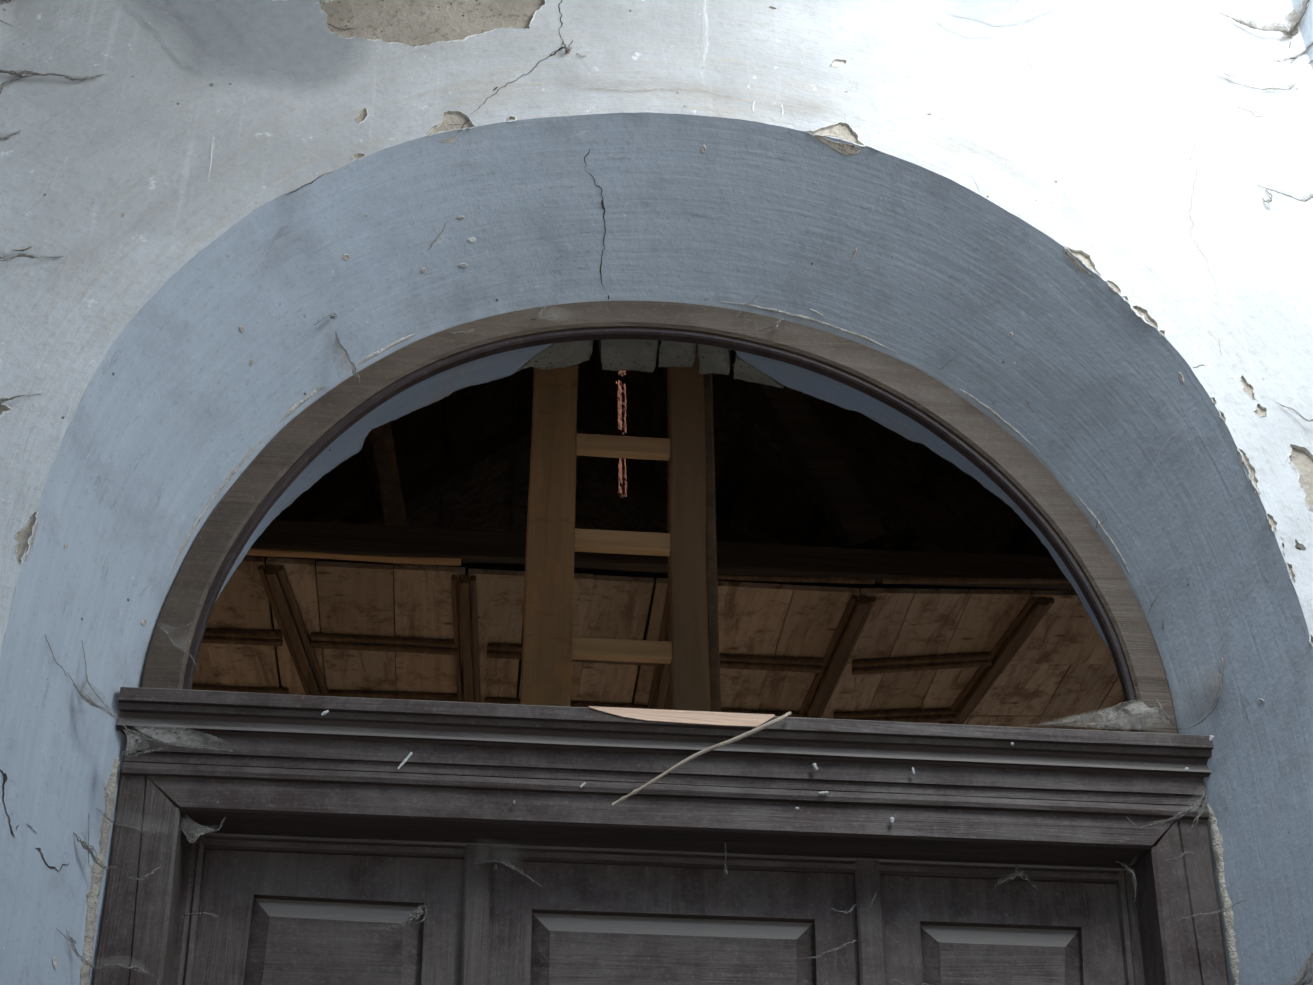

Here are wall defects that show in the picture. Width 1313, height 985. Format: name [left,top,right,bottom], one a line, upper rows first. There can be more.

spalling [318,0,546,48]
crack [470,0,573,115]
spalling [806,122,866,156]
crack [584,148,610,300]
spalling [1287,444,1313,511]
crack [0,769,69,871]